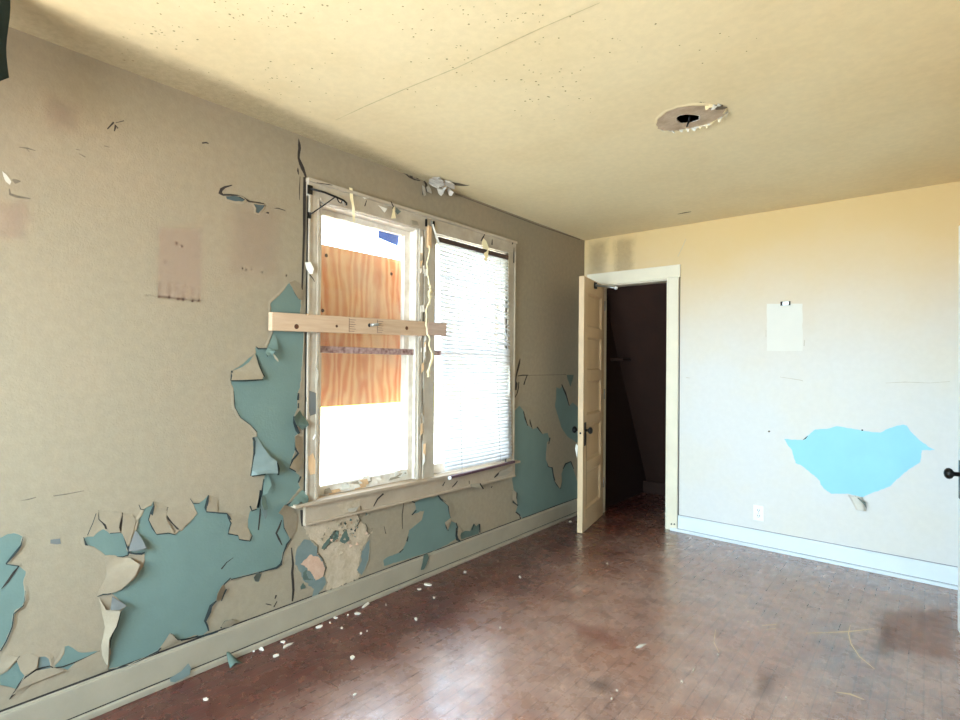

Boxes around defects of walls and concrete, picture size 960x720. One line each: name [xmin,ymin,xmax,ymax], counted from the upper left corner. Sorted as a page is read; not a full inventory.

peeling [662,103,728,133]
peeling [219,185,285,215]
crack [297,139,307,290]
peeling [481,234,493,261]
peeling [268,280,303,316]
peeling [412,220,434,377]
peeling [0,331,408,700]
peeling [382,374,578,570]
peeling [783,424,937,511]